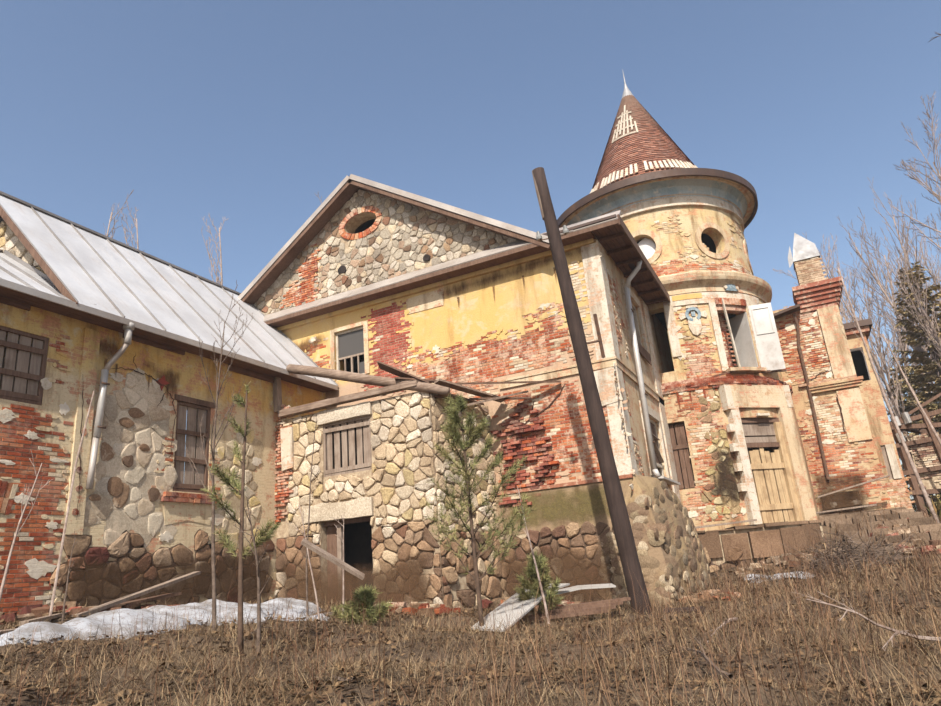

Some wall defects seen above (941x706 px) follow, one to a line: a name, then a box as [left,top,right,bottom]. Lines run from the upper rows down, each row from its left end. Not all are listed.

spalling [40,333,72,390]
flaking render [0,402,122,614]
flaking render [119,408,145,428]
flaking render [122,444,150,467]
flaking render [148,485,164,502]
flaking render [279,243,323,310]
flaking render [360,299,602,513]
peeling [567,259,595,361]
spalling [602,269,645,491]
flaking render [664,306,746,522]
flaking render [775,305,833,386]
flaking render [797,393,915,515]